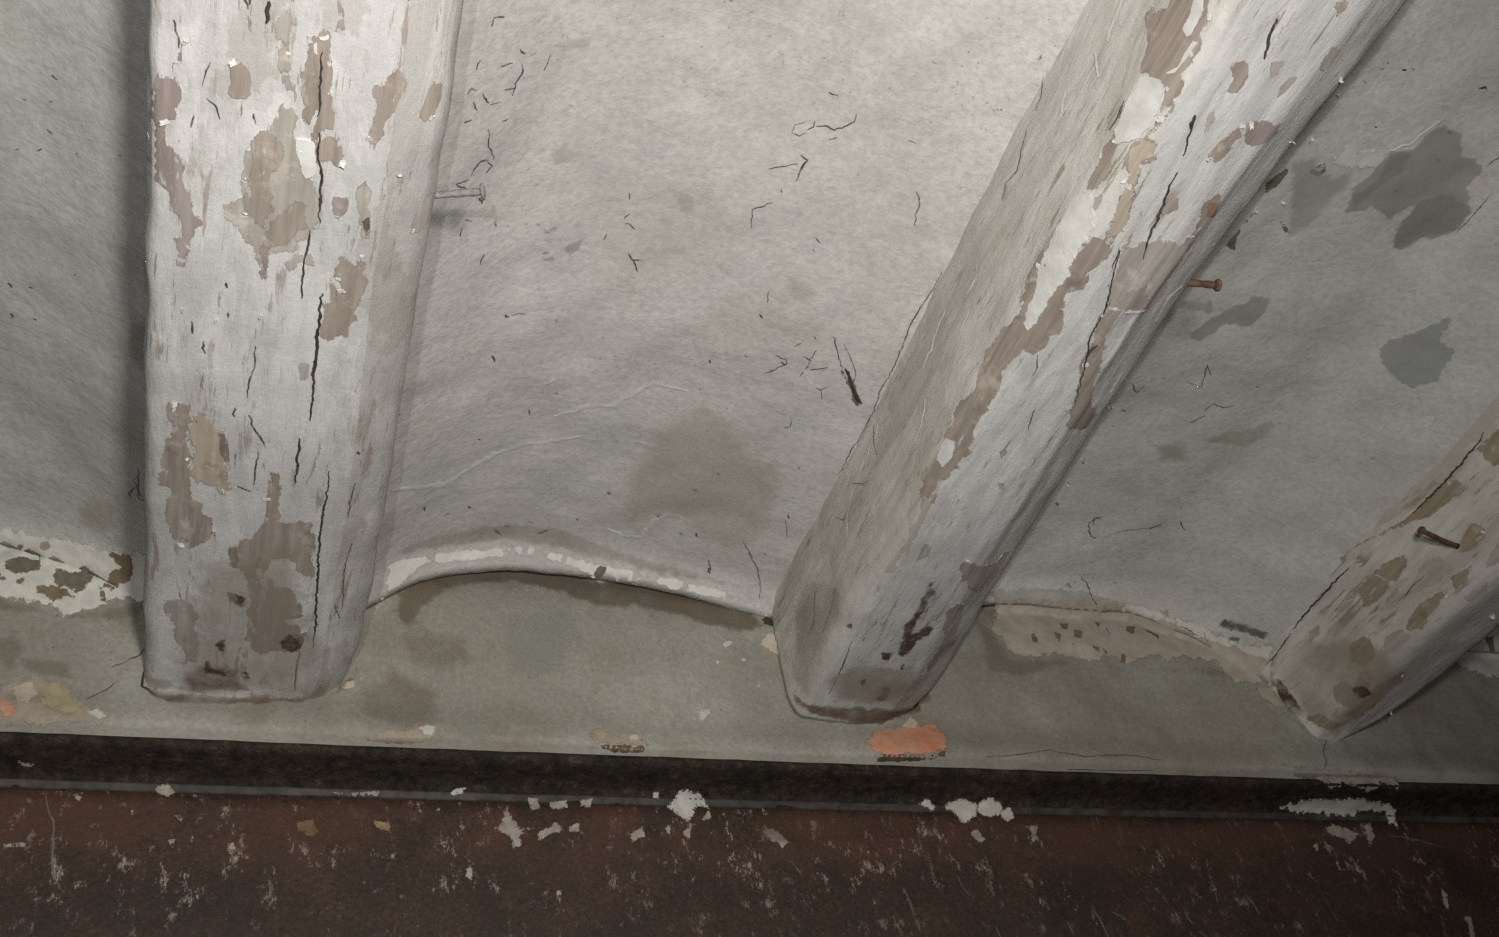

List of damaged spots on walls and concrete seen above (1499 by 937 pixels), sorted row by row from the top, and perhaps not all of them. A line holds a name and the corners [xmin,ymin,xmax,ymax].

peeling [147,39,203,267]
crack [191,283,229,354]
crack [232,52,360,691]
peeling [223,0,372,341]
peeling [366,68,407,149]
peeling [885,0,1221,572]
leakage [1347,126,1481,248]
leakage [1380,318,1454,388]
peeling [0,526,145,618]
peeling [158,401,318,663]
peeling [925,549,1287,707]
peeling [1307,523,1499,730]